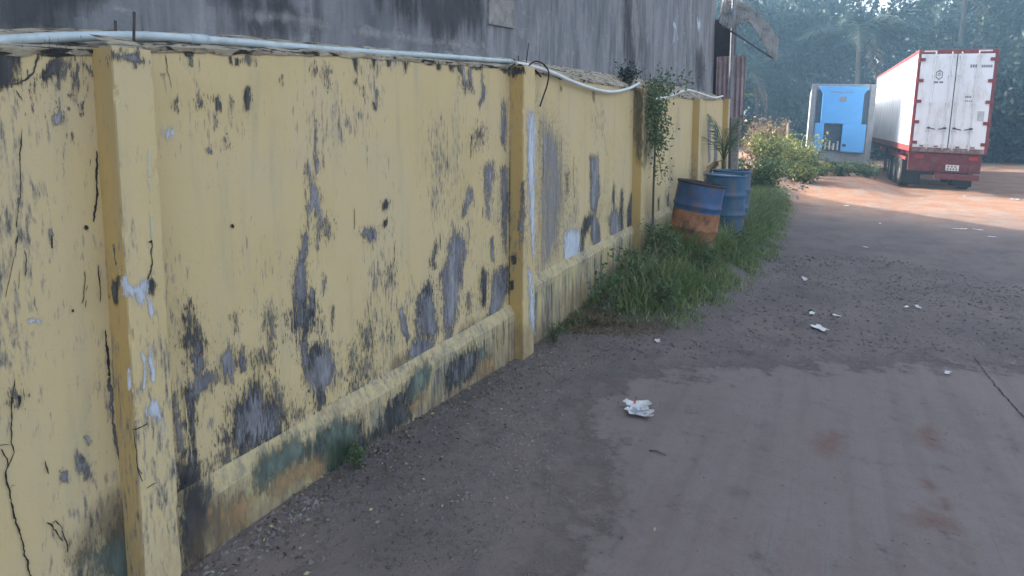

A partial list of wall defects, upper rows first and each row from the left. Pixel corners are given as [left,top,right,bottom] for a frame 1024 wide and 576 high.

peeling [309,61,333,94]
crack [5,132,27,298]
crack [90,150,99,222]
peeling [169,73,581,414]
damp [579,151,632,252]
crack [105,330,158,488]
peeling [128,350,155,390]
peeling [145,400,162,423]
crack [973,356,1024,417]
crack [0,380,32,576]
damp [171,366,414,566]